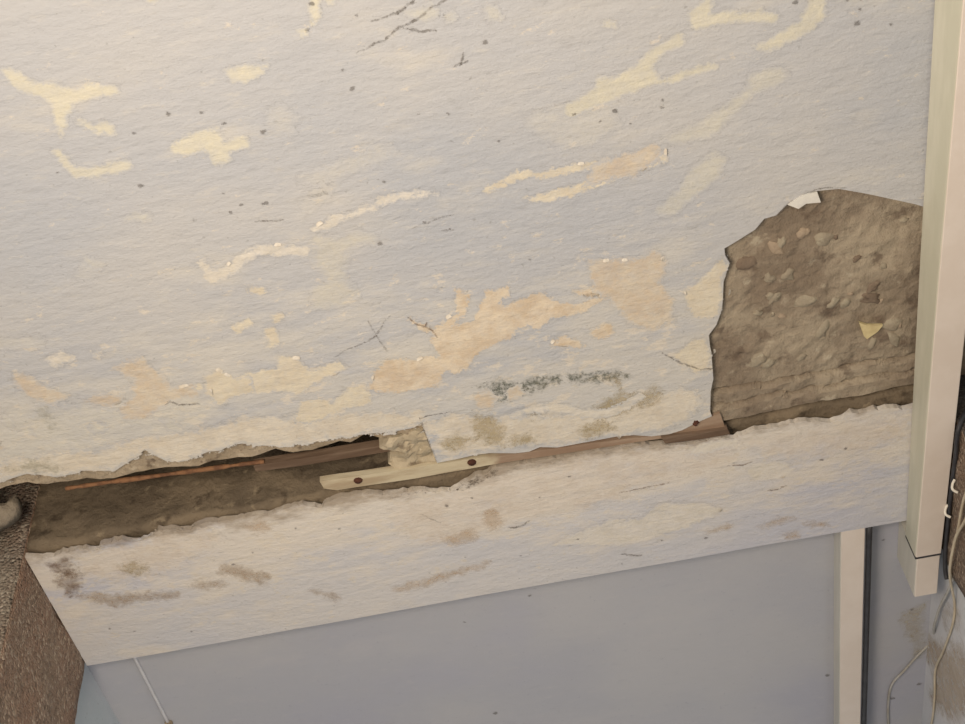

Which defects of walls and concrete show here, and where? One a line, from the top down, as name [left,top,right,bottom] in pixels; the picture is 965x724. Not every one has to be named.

peeling [0,65,135,180]
peeling [481,141,670,204]
spalling [0,189,923,547]
water stain [492,372,628,400]
rust [65,459,265,491]
peeling [77,525,230,585]